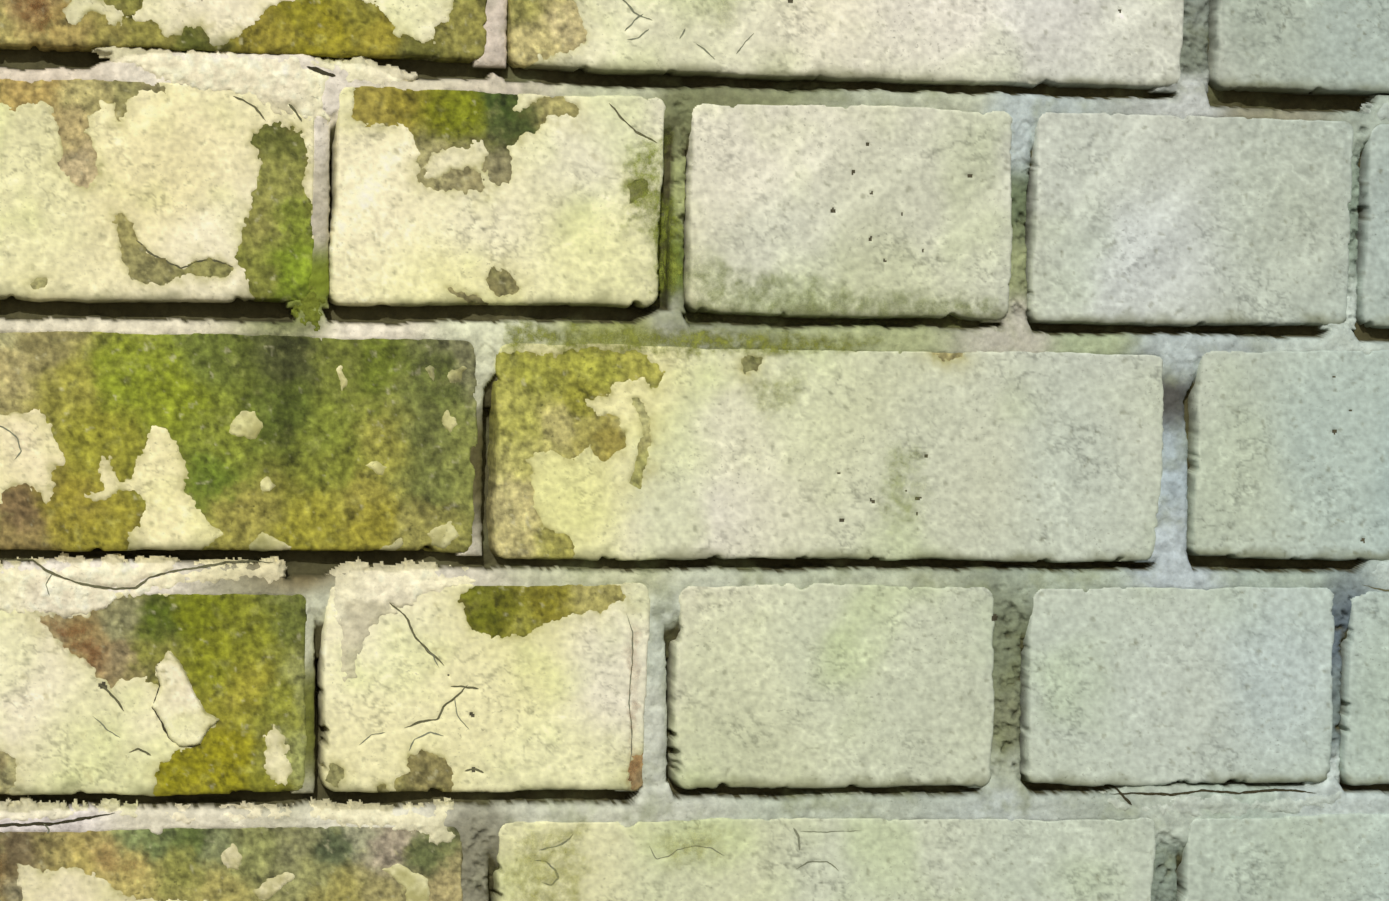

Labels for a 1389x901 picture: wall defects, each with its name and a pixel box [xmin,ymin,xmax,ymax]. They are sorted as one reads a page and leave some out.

peeling [0,0,587,305]
peeling [627,178,649,204]
peeling [0,331,665,901]
crack [361,603,478,751]